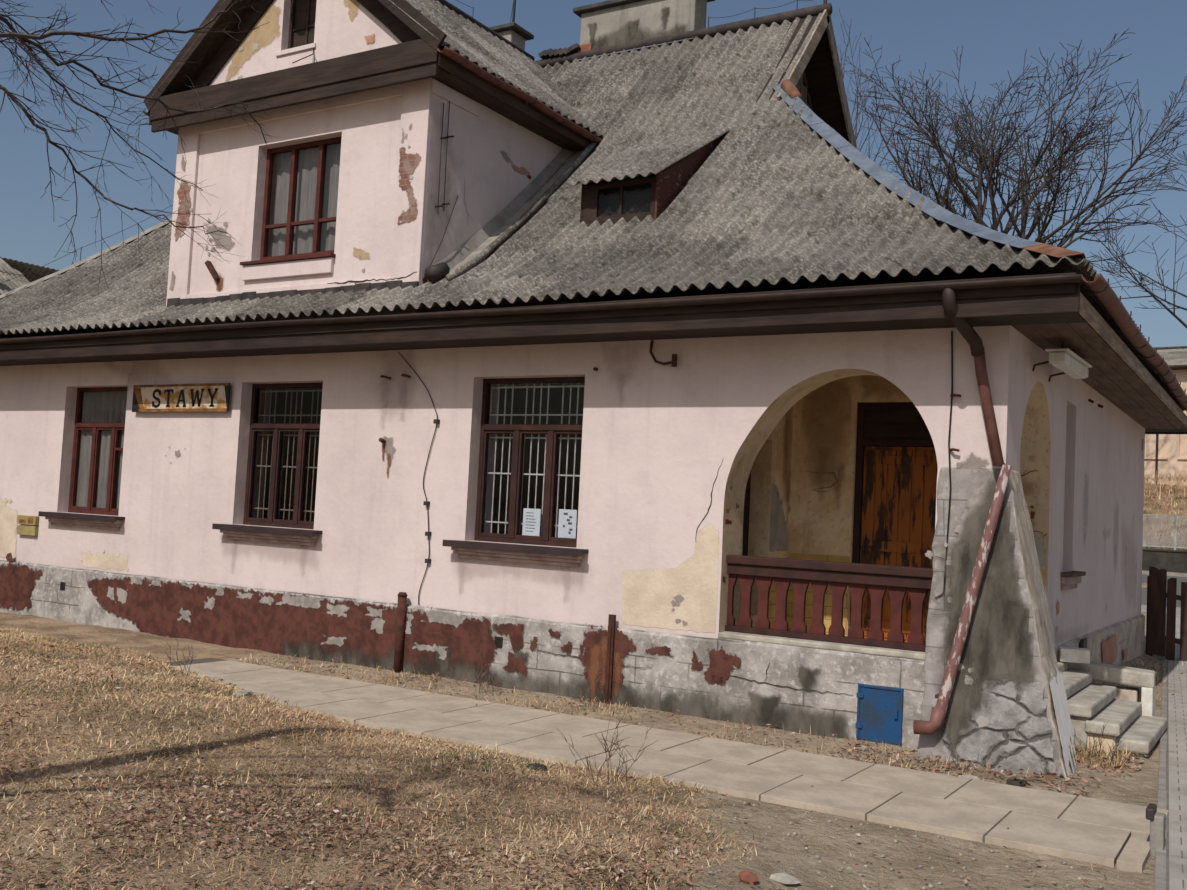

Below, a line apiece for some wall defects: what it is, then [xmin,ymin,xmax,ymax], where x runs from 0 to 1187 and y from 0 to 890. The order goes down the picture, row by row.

peeling [80,549,573,676]